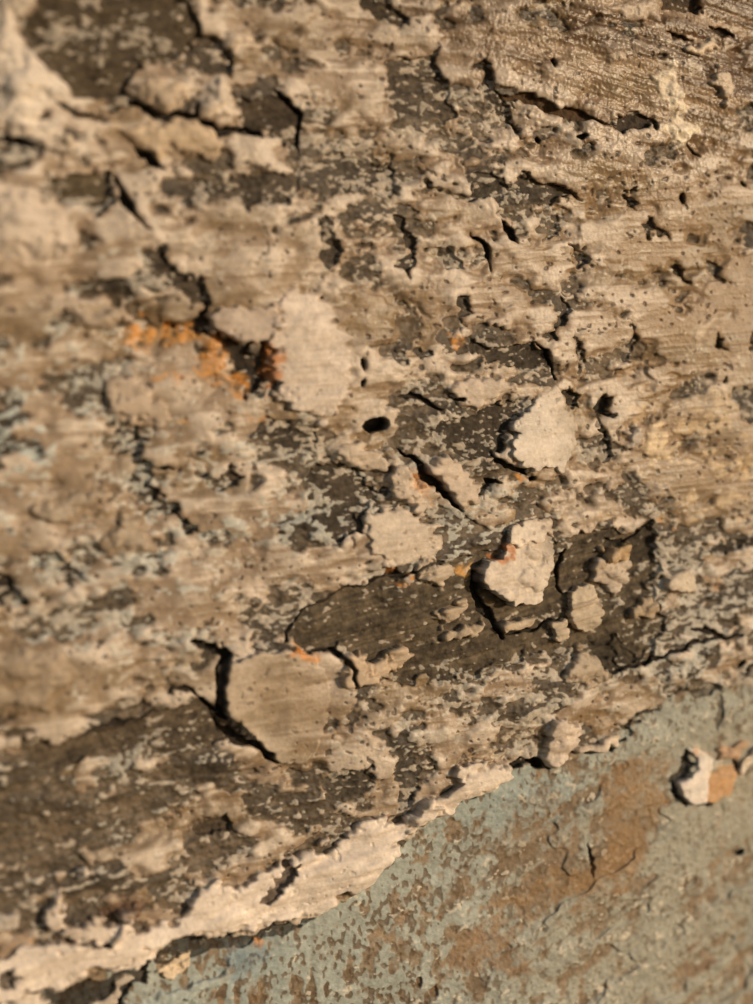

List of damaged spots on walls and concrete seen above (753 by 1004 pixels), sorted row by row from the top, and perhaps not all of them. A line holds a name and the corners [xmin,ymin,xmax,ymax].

spalling [20,0,234,114]
crack [127,98,264,138]
crack [272,89,303,153]
spalling [176,171,300,212]
spalling [423,170,580,240]
corrosion [122,311,289,435]
spalling [18,244,697,768]
crack [284,560,445,691]
crack [469,548,567,640]
peeling [667,747,742,807]
spalling [259,858,302,906]
spalling [0,918,314,1004]